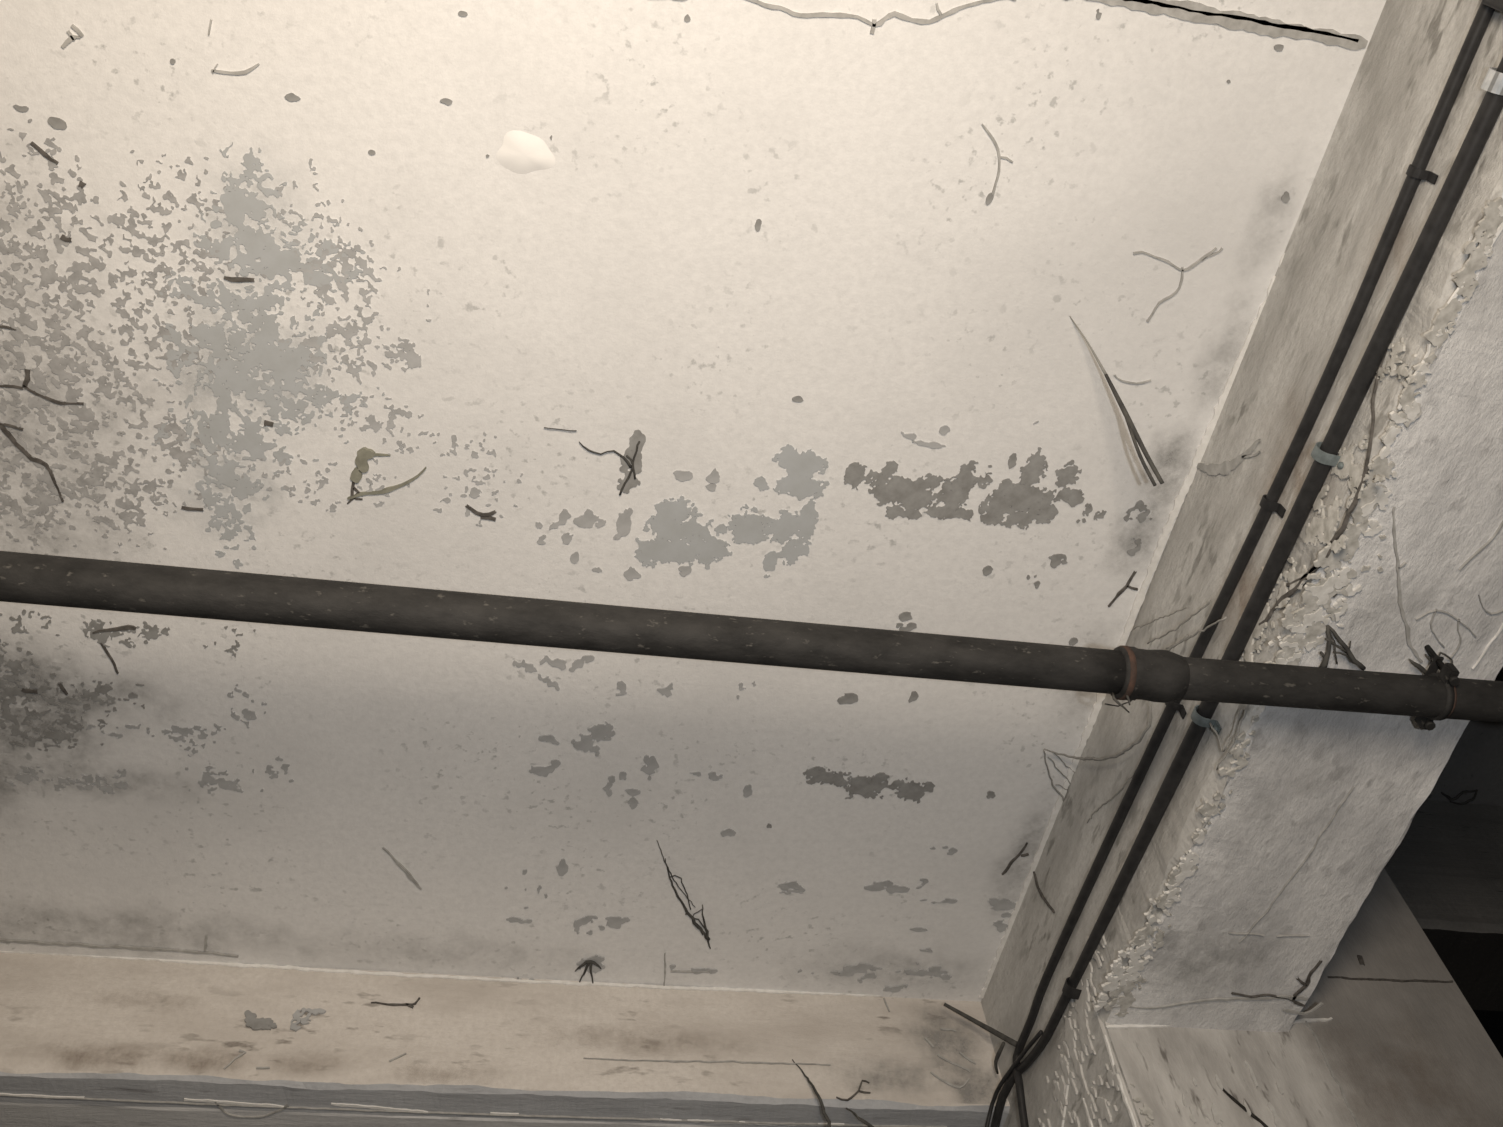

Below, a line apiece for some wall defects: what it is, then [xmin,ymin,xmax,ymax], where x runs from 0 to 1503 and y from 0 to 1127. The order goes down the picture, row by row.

crack [748,0,1016,34]
peeling [535,430,1152,581]
peeling [1026,554,1068,589]
peeling [513,655,595,691]
peeling [616,680,627,696]
peeling [657,683,673,697]
peeling [529,721,616,777]
peeling [602,755,659,809]
peeling [803,766,935,803]